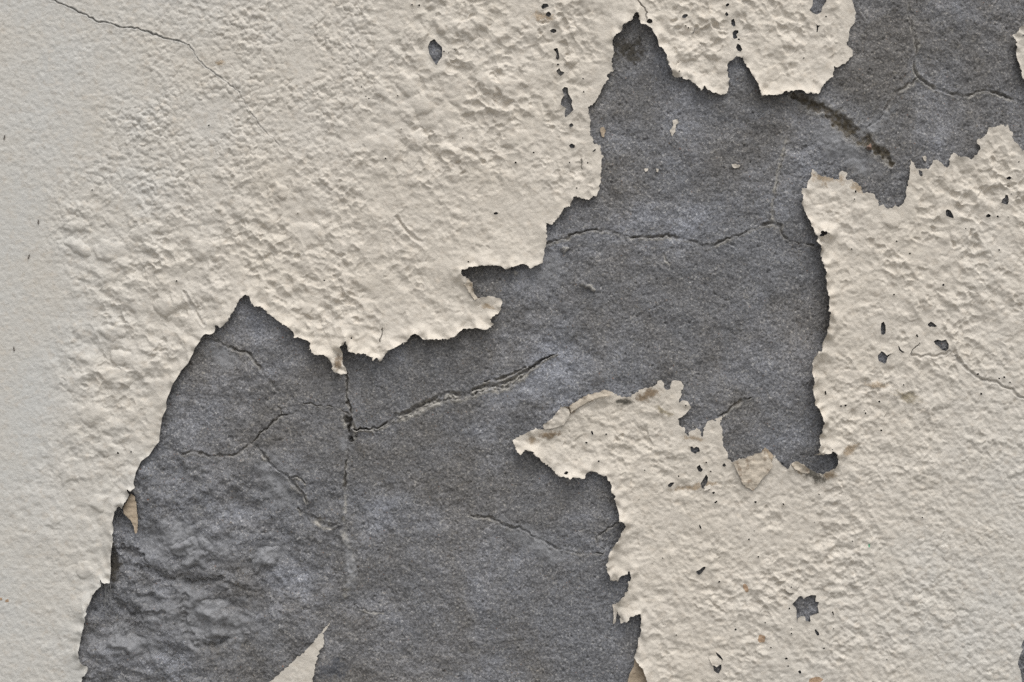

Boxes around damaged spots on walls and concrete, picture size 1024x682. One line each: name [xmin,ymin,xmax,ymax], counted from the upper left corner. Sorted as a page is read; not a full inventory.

crack [49,0,281,147]
peeling [561,90,573,127]
spalling [787,90,898,169]
peeling [818,0,1024,123]
crack [865,0,1024,129]
crack [546,134,817,267]
peeling [460,271,502,329]
peeling [306,337,352,375]
crack [164,334,560,615]
peeling [513,428,541,456]
spalling [129,540,263,601]
peeling [628,659,647,682]